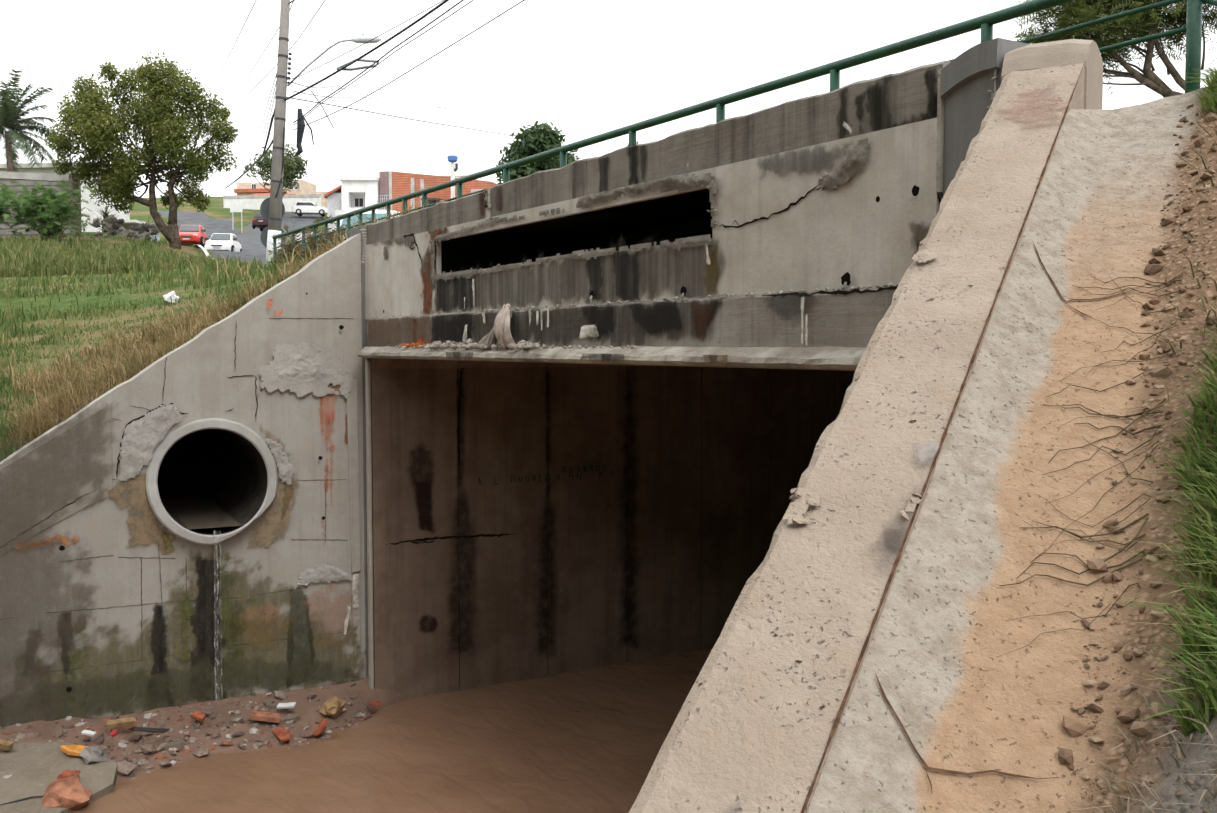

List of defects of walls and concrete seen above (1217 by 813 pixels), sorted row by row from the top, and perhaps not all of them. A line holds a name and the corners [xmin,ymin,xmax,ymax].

spalling [430,172,718,281]
crack [718,185,820,228]
damp [431,240,723,479]
spalling [119,404,182,481]
damp [0,411,359,728]
damp [409,447,432,530]
damp [420,495,474,651]
crack [385,533,512,545]
damp [623,382,638,647]